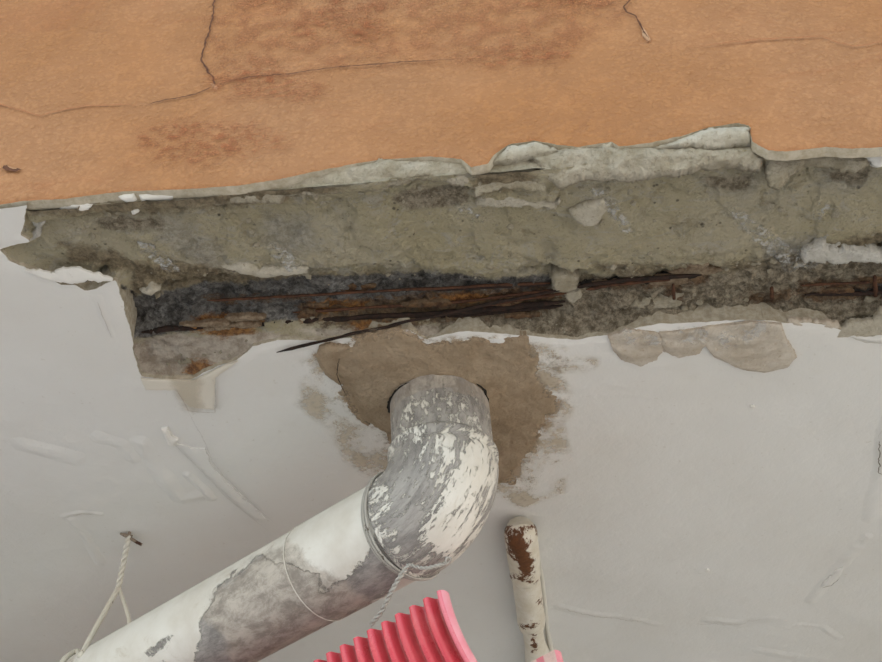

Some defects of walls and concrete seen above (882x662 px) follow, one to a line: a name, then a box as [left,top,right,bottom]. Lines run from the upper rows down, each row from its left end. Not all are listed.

crack [0,0,450,116]
crack [623,0,651,43]
spalling [2,126,882,413]
crack [861,413,882,523]